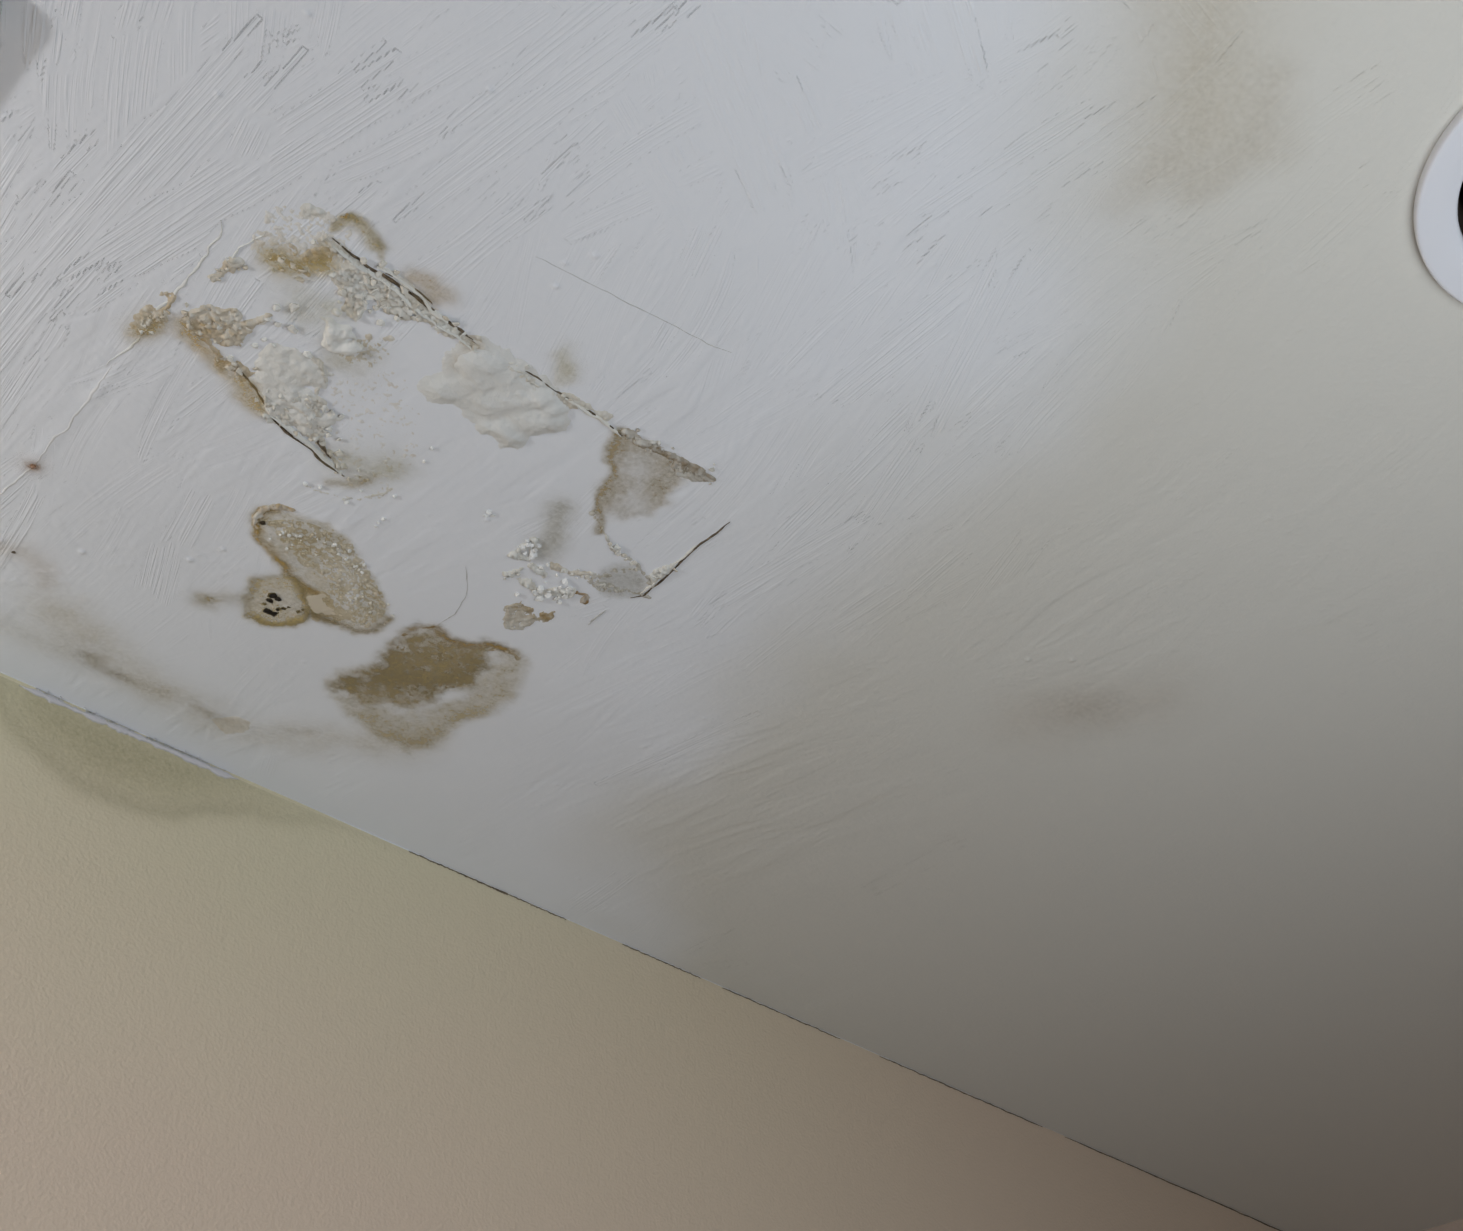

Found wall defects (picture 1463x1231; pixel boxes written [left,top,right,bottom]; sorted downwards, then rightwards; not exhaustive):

spalling [106,203,434,504]
leakage [596,428,716,534]
leakage [245,574,312,627]
spalling [251,503,395,633]
peeling [502,510,730,630]
leakage [334,626,521,745]